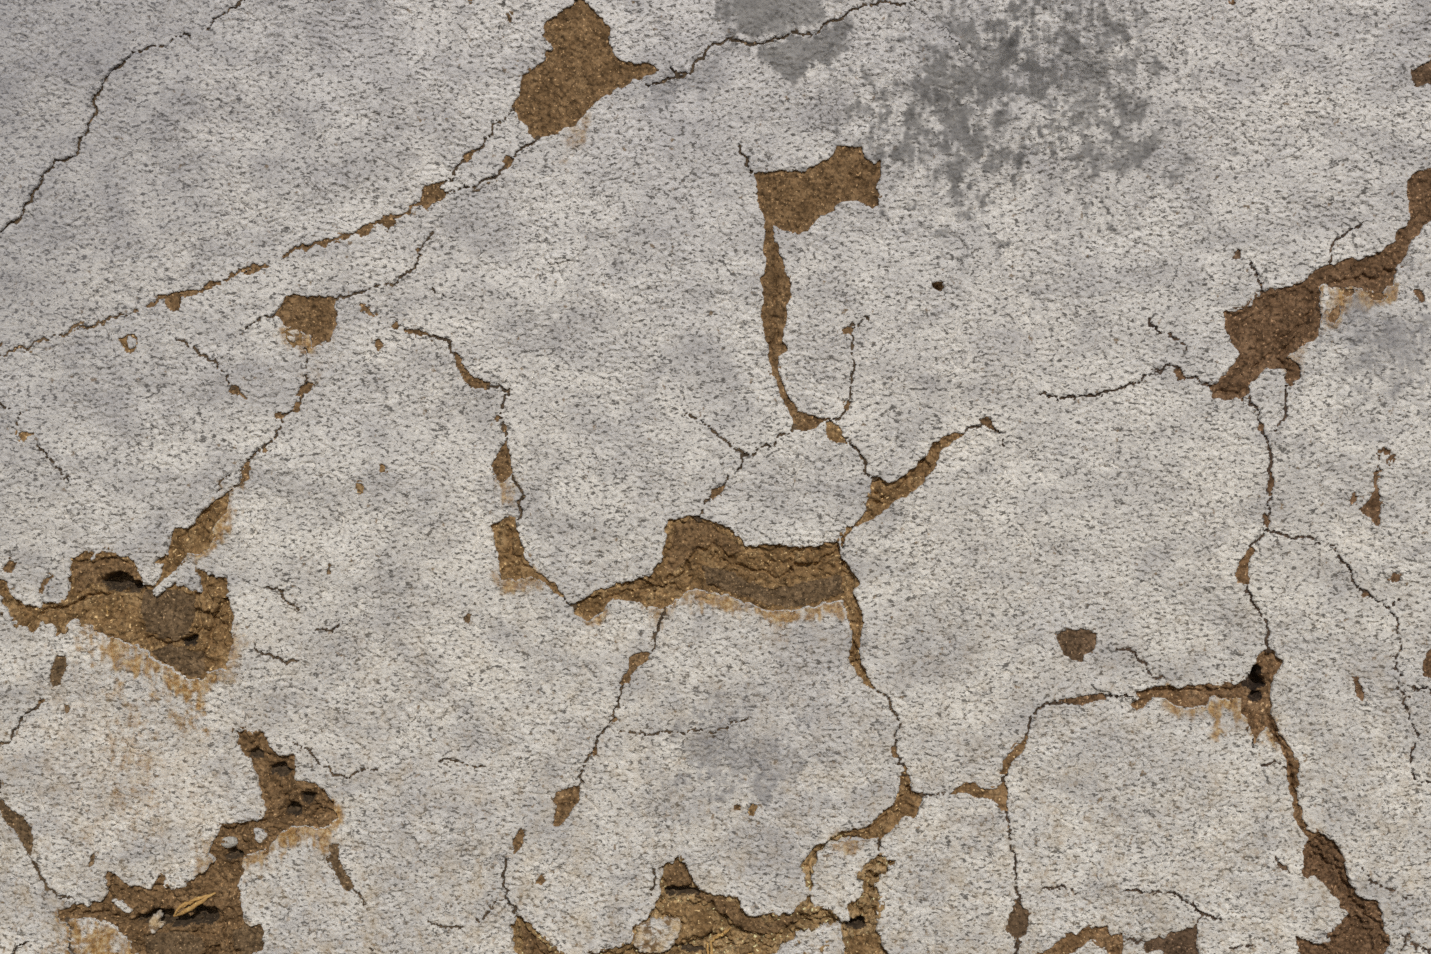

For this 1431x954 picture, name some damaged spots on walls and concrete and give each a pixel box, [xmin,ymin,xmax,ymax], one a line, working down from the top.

crack [0,0,245,233]
spalling [512,0,659,138]
crack [217,347,315,495]
crack [0,107,540,390]
spalling [245,231,434,348]
crack [684,315,870,521]
crack [1039,379,1142,401]
spalling [0,492,234,680]
spalling [375,144,1431,954]
crack [1235,394,1431,784]
spalling [0,655,69,745]
spalling [0,726,338,954]